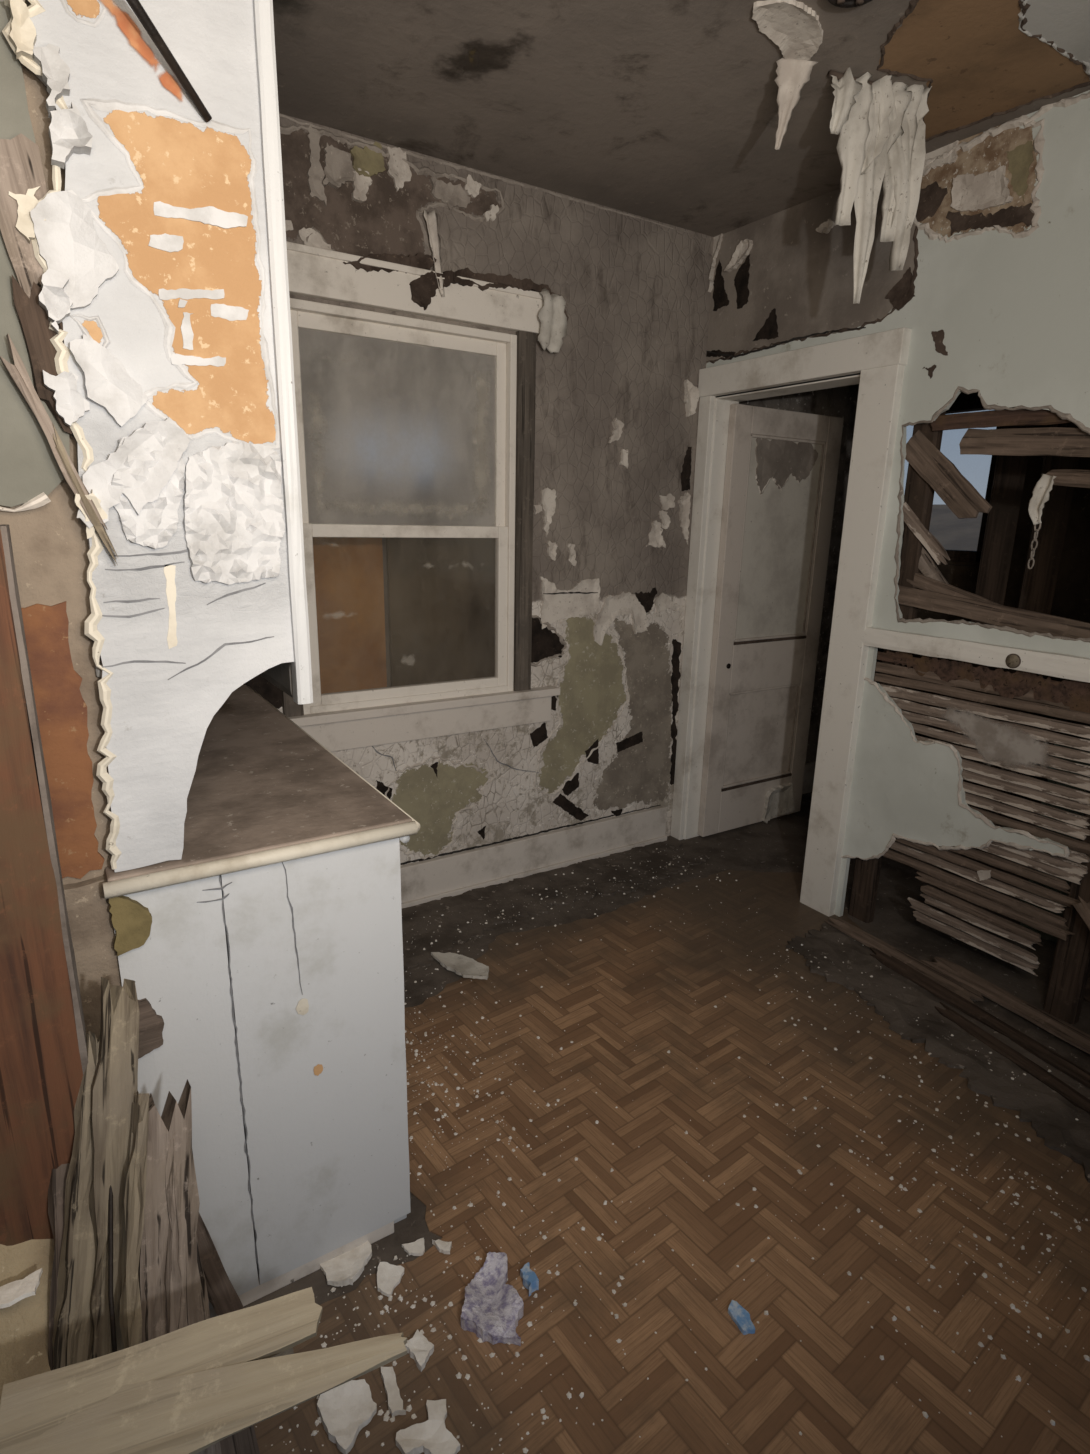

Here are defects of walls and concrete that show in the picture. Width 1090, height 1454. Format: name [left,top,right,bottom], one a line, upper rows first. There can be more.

peeling [0,0,36,144]
peeling [752,0,1090,311]
peeling [280,124,569,353]
spalling [708,234,753,311]
peeling [0,230,70,512]
peeling [534,488,577,566]
peeling [646,447,692,548]
crack [102,549,188,618]
crack [207,582,266,605]
crack [102,636,274,680]
peeling [530,588,681,821]
peeling [376,756,497,861]